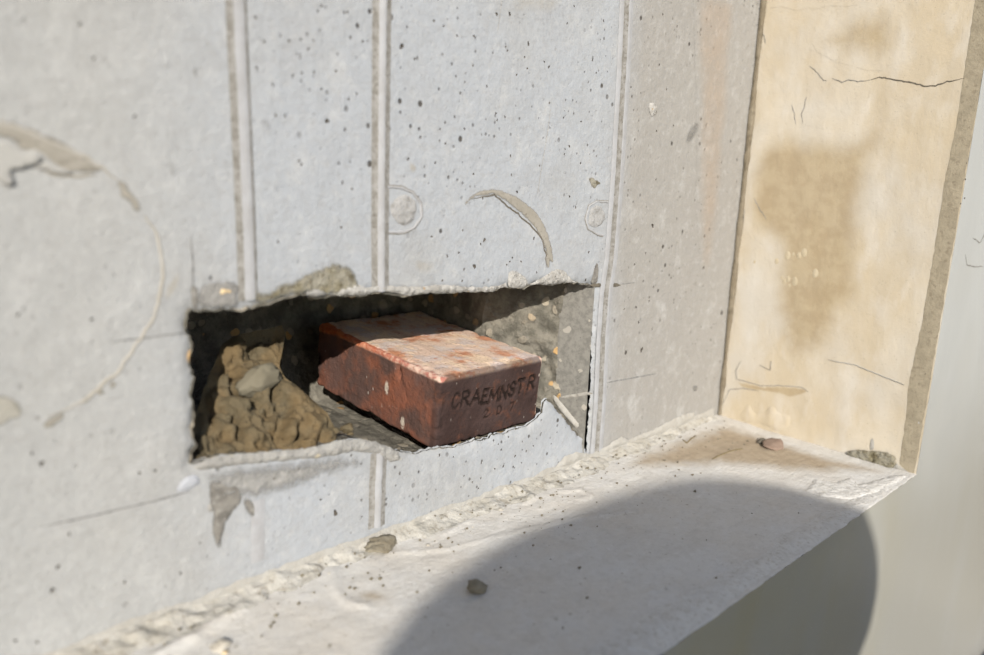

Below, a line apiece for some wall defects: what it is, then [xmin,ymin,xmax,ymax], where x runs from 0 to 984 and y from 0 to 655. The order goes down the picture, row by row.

damp [727,0,911,367]
crack [791,66,964,124]
spalling [177,190,590,545]